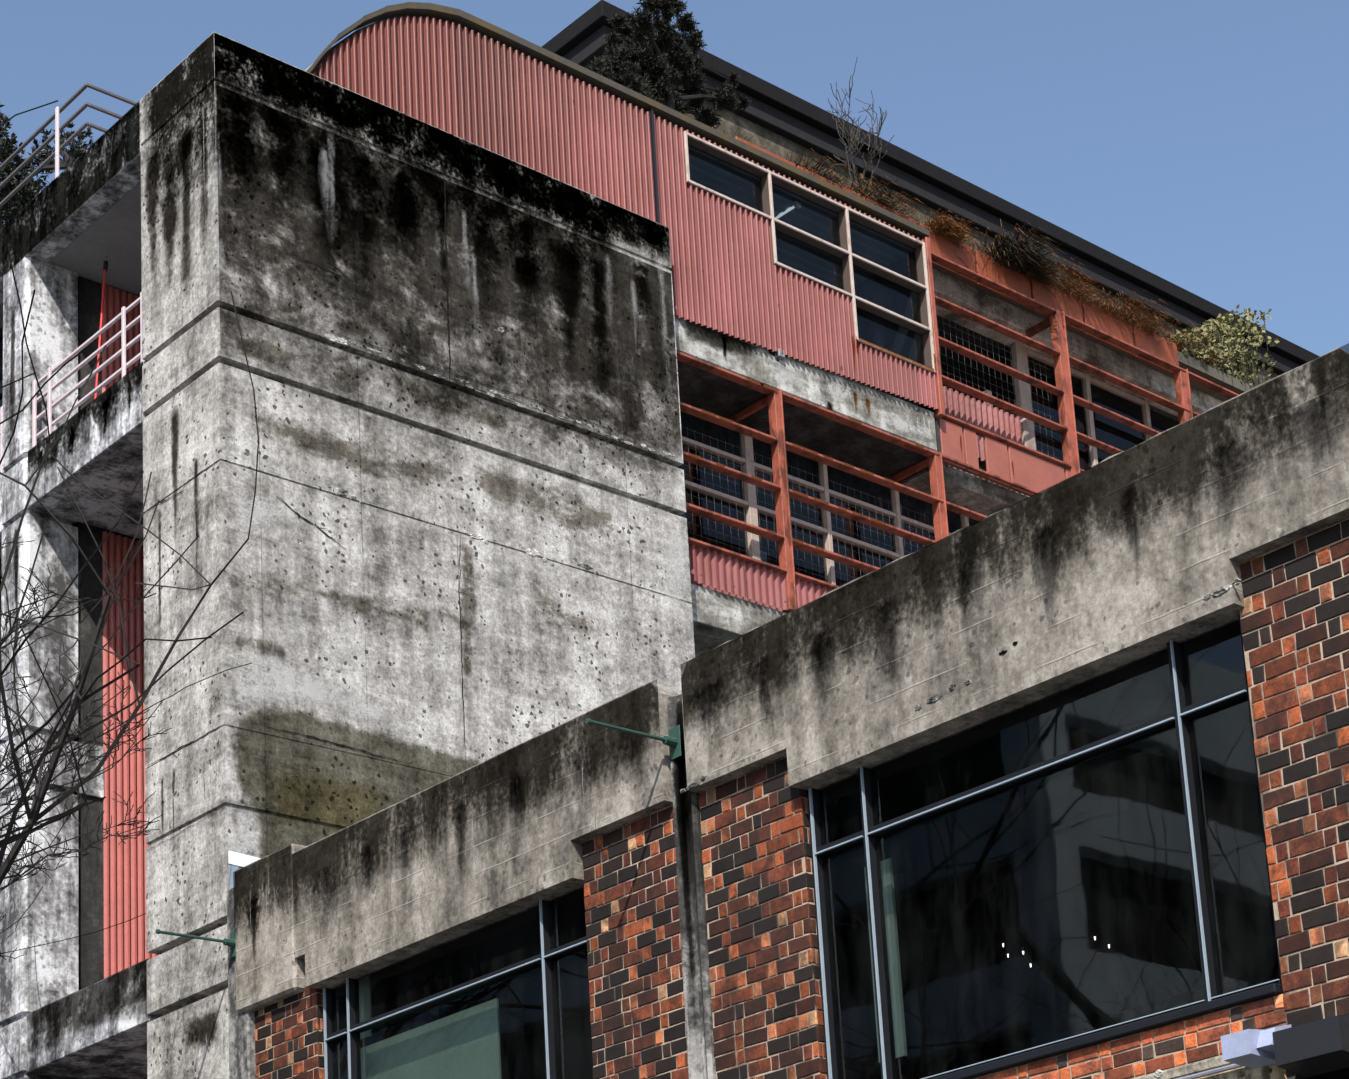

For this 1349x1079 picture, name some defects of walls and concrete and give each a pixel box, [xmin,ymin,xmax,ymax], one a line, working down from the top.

leakage [0,32,670,381]
leakage [1035,525,1055,598]
leakage [879,603,895,664]